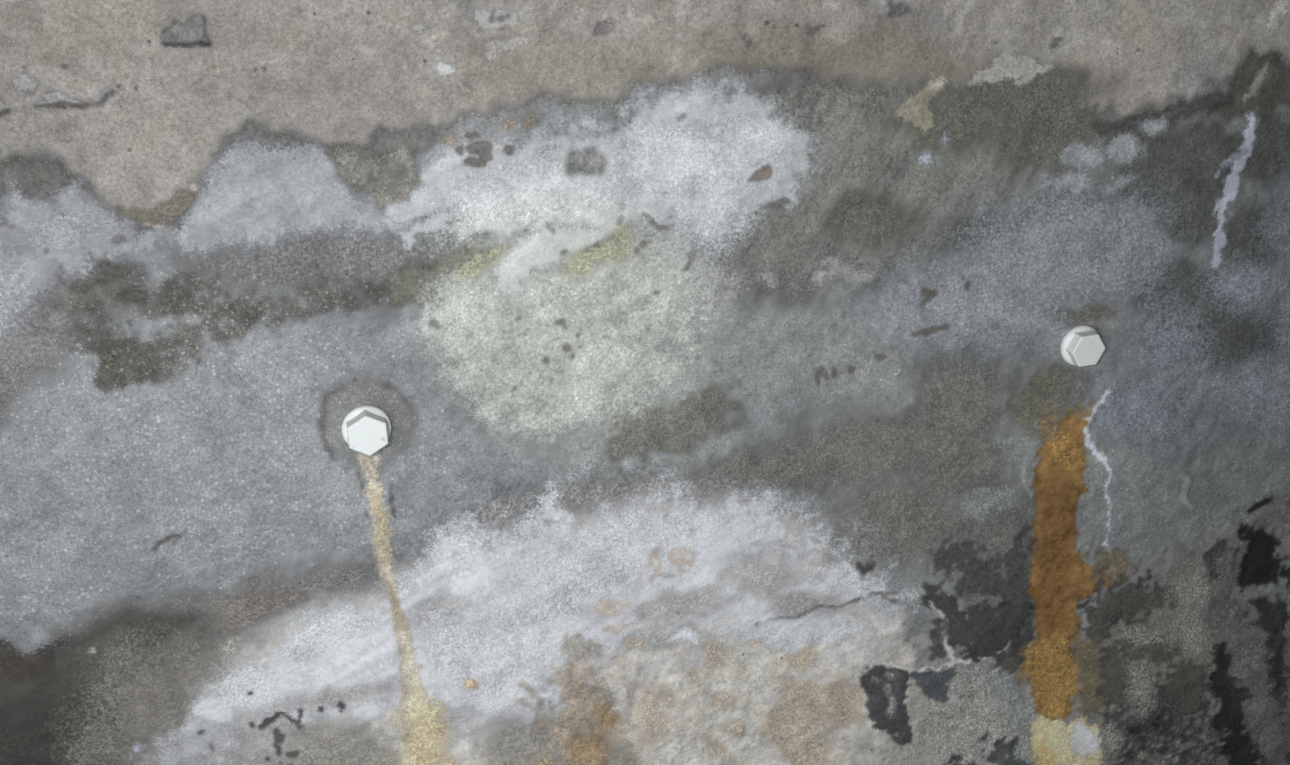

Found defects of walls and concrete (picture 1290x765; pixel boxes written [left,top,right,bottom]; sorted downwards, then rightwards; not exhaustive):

corrosion [358,453,455,765]
corrosion [1016,398,1135,765]
damp [1226,542,1290,624]
damp [1101,723,1123,754]
damp [1116,725,1130,749]
damp [1172,740,1198,757]
damp [1178,689,1233,752]
damp [1215,754,1234,765]